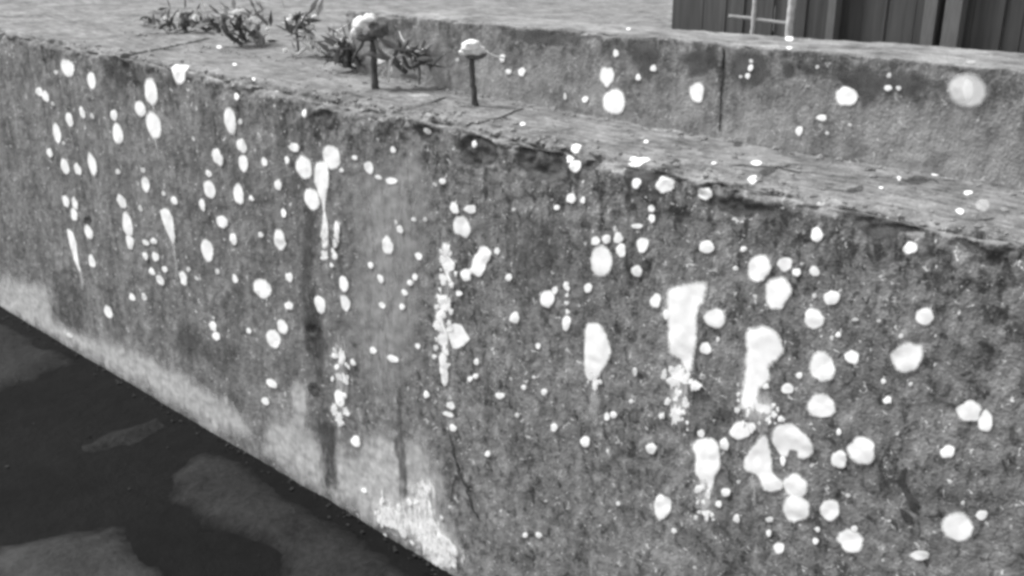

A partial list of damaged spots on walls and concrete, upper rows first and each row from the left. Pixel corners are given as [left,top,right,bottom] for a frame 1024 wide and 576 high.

water stain [264,155,465,570]
crack [448,434,479,519]